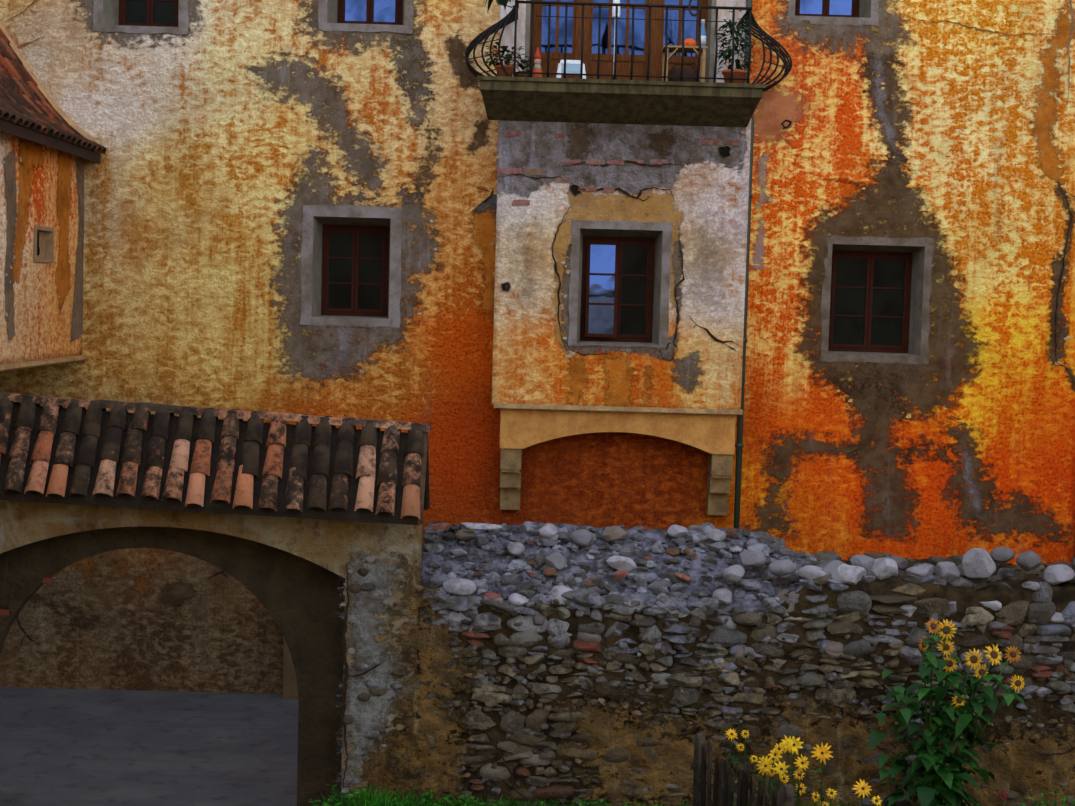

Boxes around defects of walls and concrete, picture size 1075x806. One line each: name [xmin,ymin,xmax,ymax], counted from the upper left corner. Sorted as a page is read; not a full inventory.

crack [5,0,44,48]
crack [905,0,1075,103]
crack [475,160,684,356]
spalling [473,120,750,358]
crack [660,227,739,362]
flaking render [752,221,765,270]
flaking render [755,152,774,207]
crack [1054,182,1075,384]
flaking render [336,550,489,806]